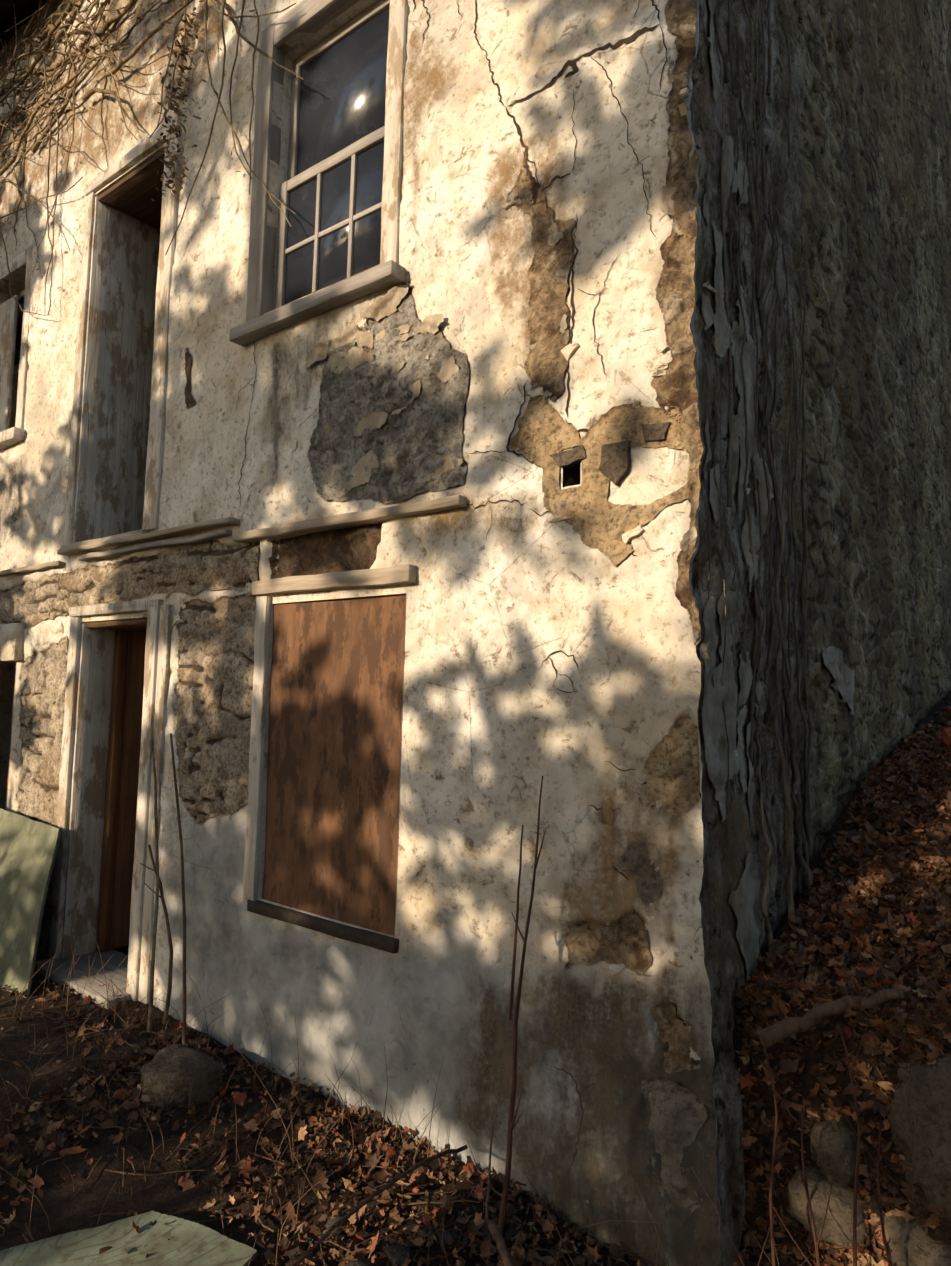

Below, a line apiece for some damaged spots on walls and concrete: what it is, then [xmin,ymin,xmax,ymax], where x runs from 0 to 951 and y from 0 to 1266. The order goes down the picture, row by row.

crack [412,0,667,432]
flaking render [306,282,470,505]
flaking render [501,0,774,823]
flaking render [0,523,382,827]
flaking render [822,646,855,715]
flaking render [39,866,54,956]
flaking render [564,841,664,976]
flaking render [729,852,765,979]
flaking render [642,1001,708,1224]